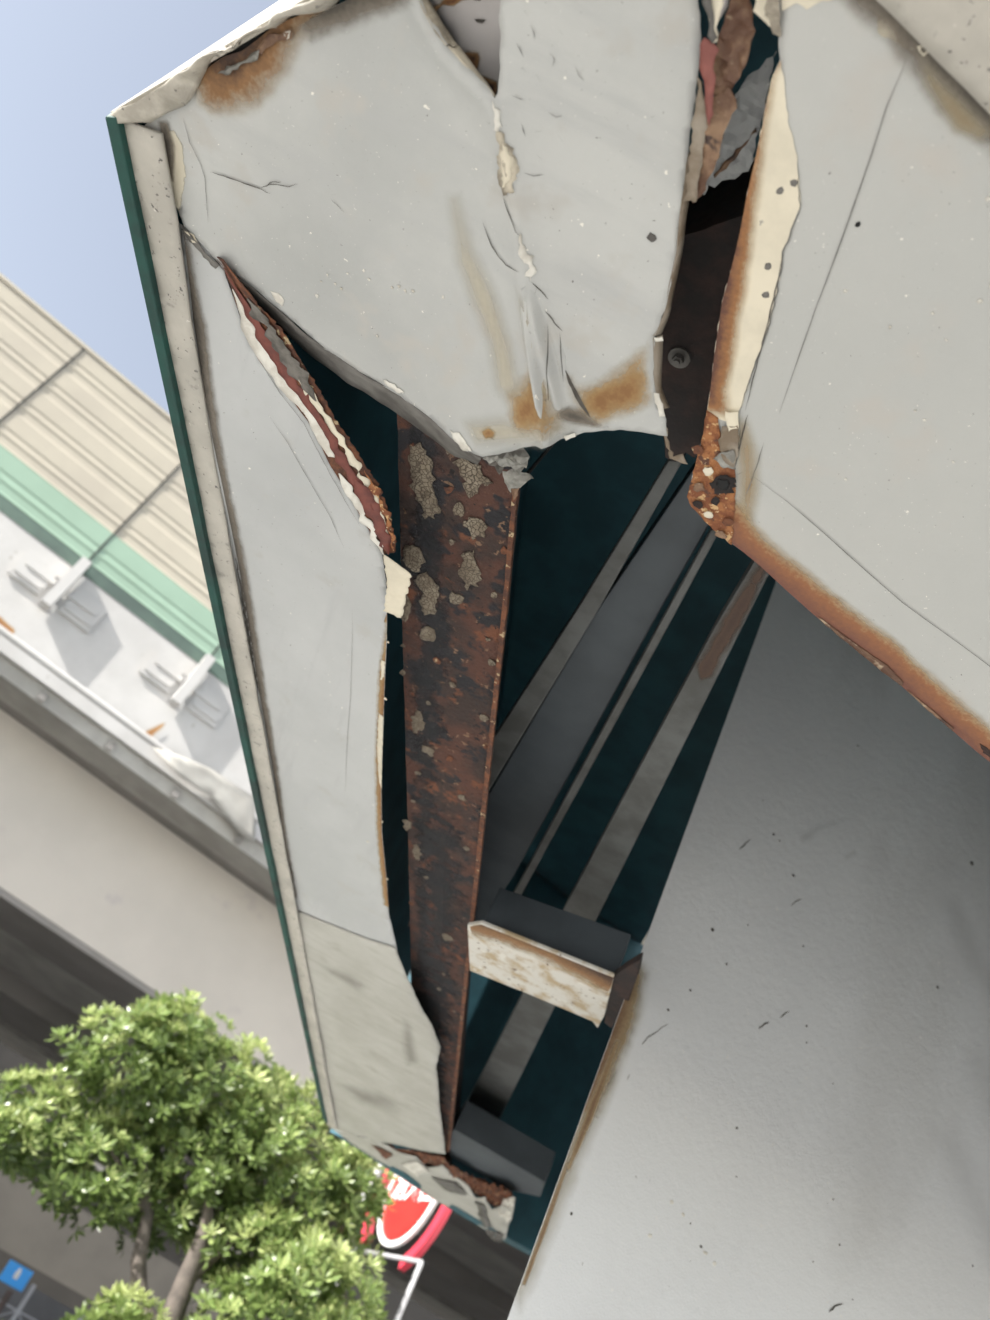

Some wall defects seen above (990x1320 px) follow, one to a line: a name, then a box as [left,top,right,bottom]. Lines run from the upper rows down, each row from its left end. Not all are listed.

peeling [160,122,186,210]
crack [183,119,296,215]
corrosion [198,12,320,110]
corrosion [580,358,647,420]
peeling [654,393,665,417]
peeling [707,65,801,469]
corrosion [687,89,990,762]
crack [783,43,912,402]
crack [735,252,989,666]
corrosion [375,614,388,907]
corrosion [409,429,613,1125]
peeling [371,1145,491,1228]